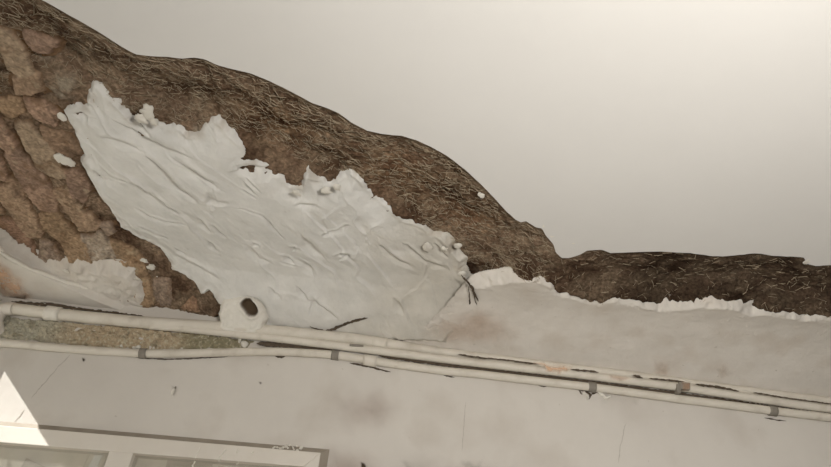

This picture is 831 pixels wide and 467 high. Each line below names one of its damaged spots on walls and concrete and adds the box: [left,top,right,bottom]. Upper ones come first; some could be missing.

flaking render [0,25,173,308]